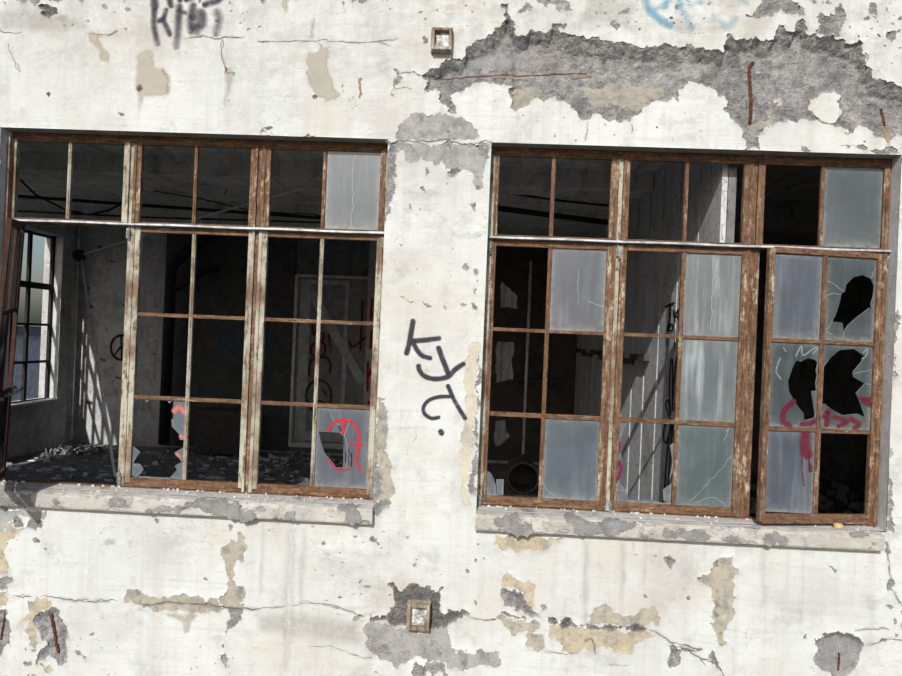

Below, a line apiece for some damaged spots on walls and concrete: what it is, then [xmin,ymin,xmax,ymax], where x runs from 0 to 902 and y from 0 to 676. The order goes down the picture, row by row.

spalling [385,0,902,222]
peeling [0,576,13,590]
spalling [0,607,94,676]
crack [14,595,116,603]
crack [142,601,361,616]
flaking render [326,574,501,676]
peeling [500,588,655,633]
spalling [803,631,864,676]